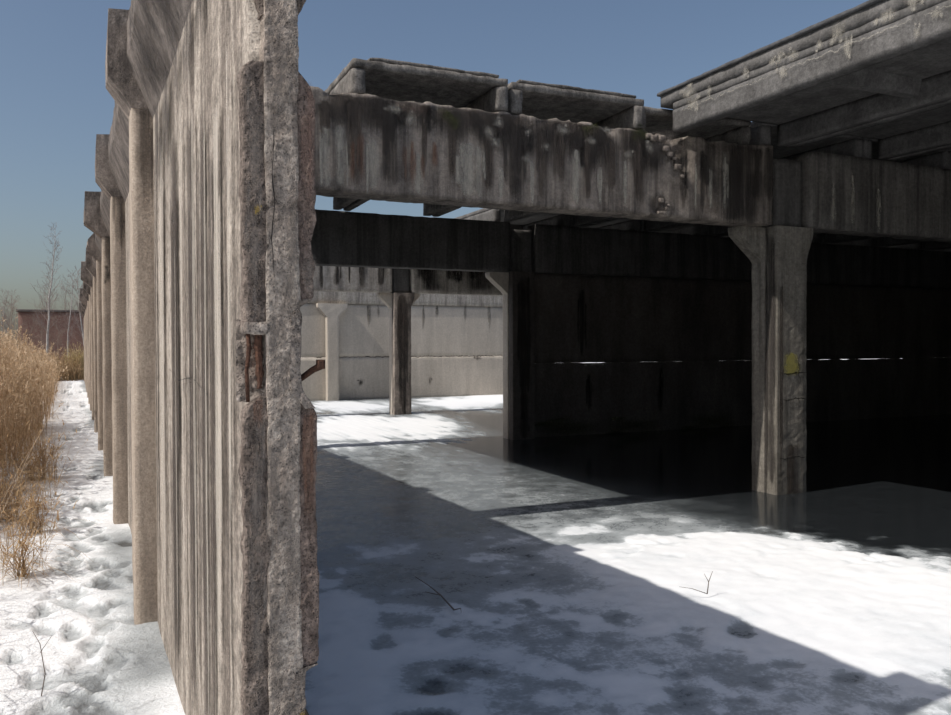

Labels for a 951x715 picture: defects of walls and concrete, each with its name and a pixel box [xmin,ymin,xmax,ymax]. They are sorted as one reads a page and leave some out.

crack [268,131,281,277]
water stain [318,94,773,224]
water stain [765,237,797,494]